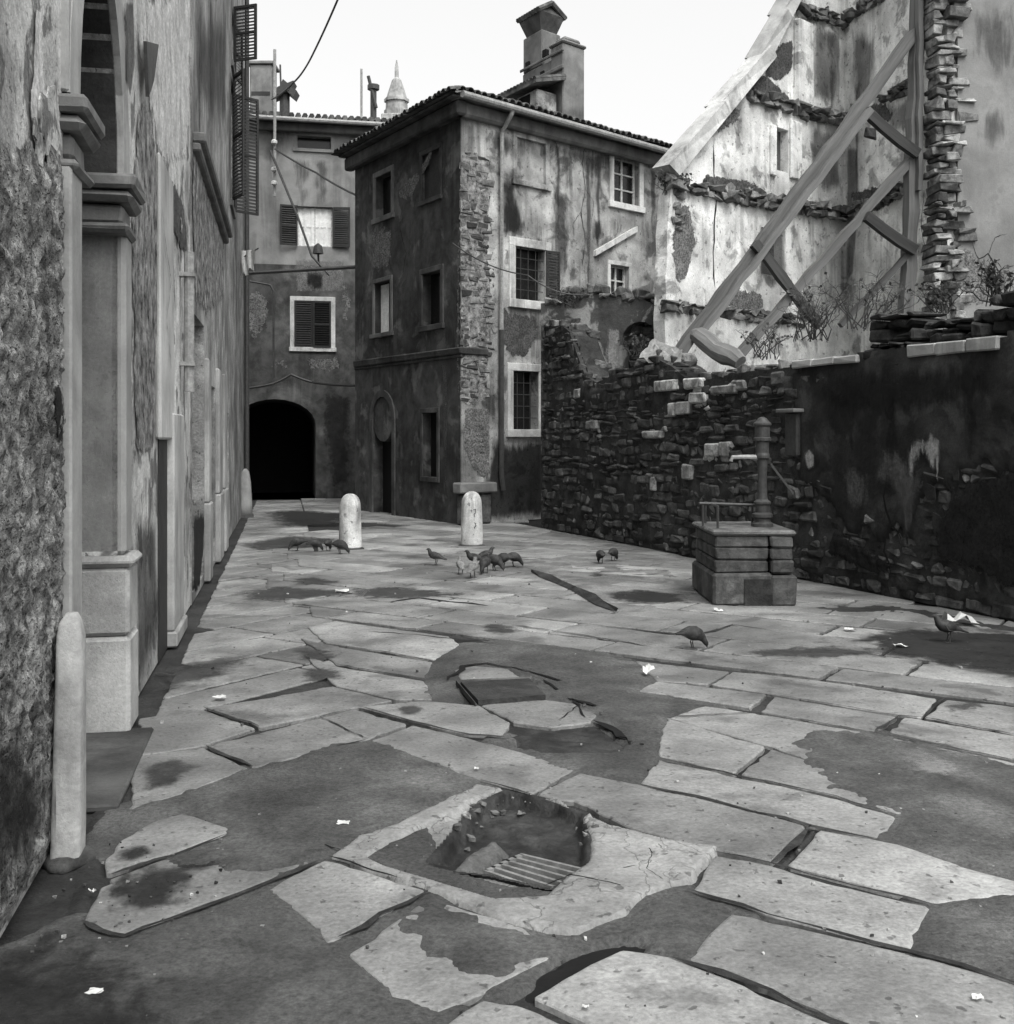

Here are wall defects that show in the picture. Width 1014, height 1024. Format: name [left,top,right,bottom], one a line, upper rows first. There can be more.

peeling [750,40,793,100]
flaking render [456,152,538,412]
peeling [671,205,697,283]
leakage [824,366,986,455]
leakage [878,436,939,527]
crack [546,874,629,887]